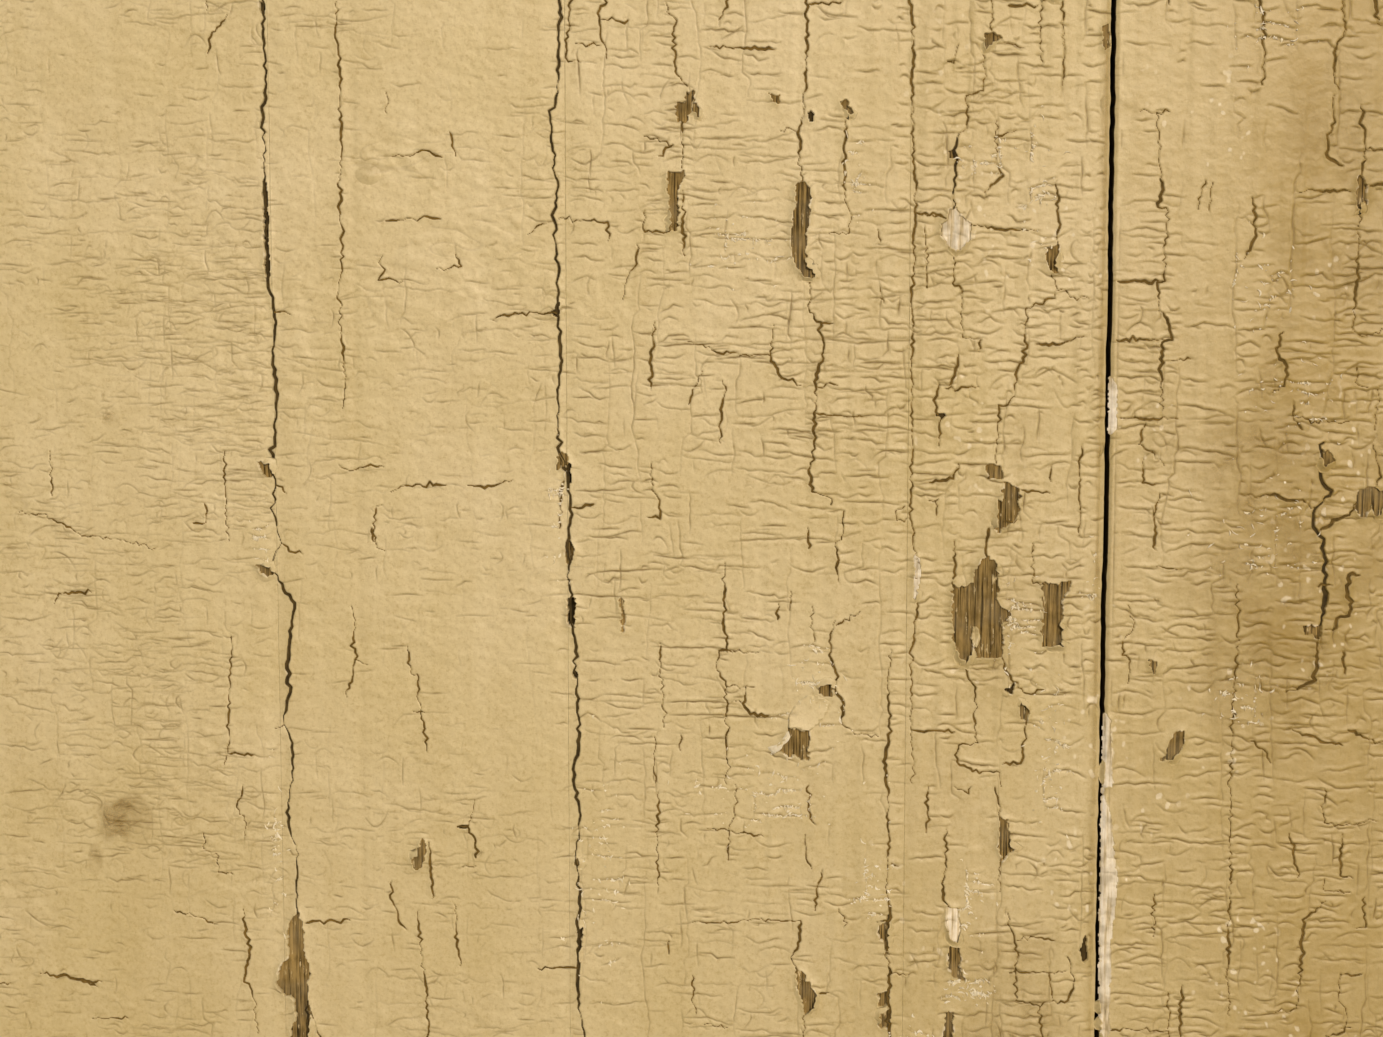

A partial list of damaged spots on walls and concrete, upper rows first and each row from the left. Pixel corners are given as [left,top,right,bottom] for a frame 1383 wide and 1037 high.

crack [260,0,350,925]
crack [493,0,688,1037]
peeling [663,170,685,232]
peeling [690,182,822,282]
crack [688,282,865,581]
crack [713,0,842,181]
crack [775,0,1213,1037]
crack [1255,0,1383,693]
peeling [1355,485,1383,521]
peeling [694,644,853,828]
peeling [951,536,1100,823]
peeling [277,912,317,1037]